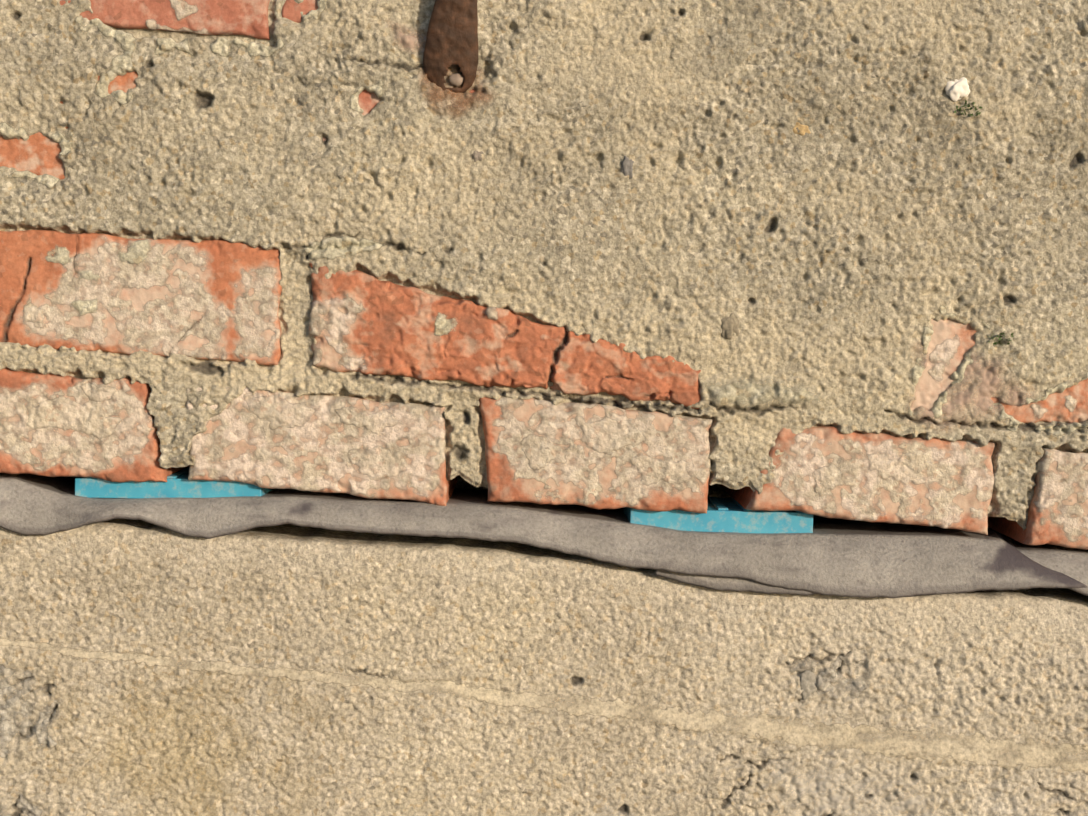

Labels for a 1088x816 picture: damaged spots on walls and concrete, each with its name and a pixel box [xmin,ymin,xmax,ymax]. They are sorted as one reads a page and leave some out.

flaking render [75,0,284,104]
flaking render [0,122,30,141]
flaking render [0,170,59,188]
crack [3,259,31,342]
peeling [23,238,280,374]
peeling [308,294,366,371]
peeling [434,313,457,336]
flaking render [912,326,973,418]
peeling [186,386,467,497]
spalling [0,664,57,758]
crack [20,677,58,734]
crack [721,756,782,806]